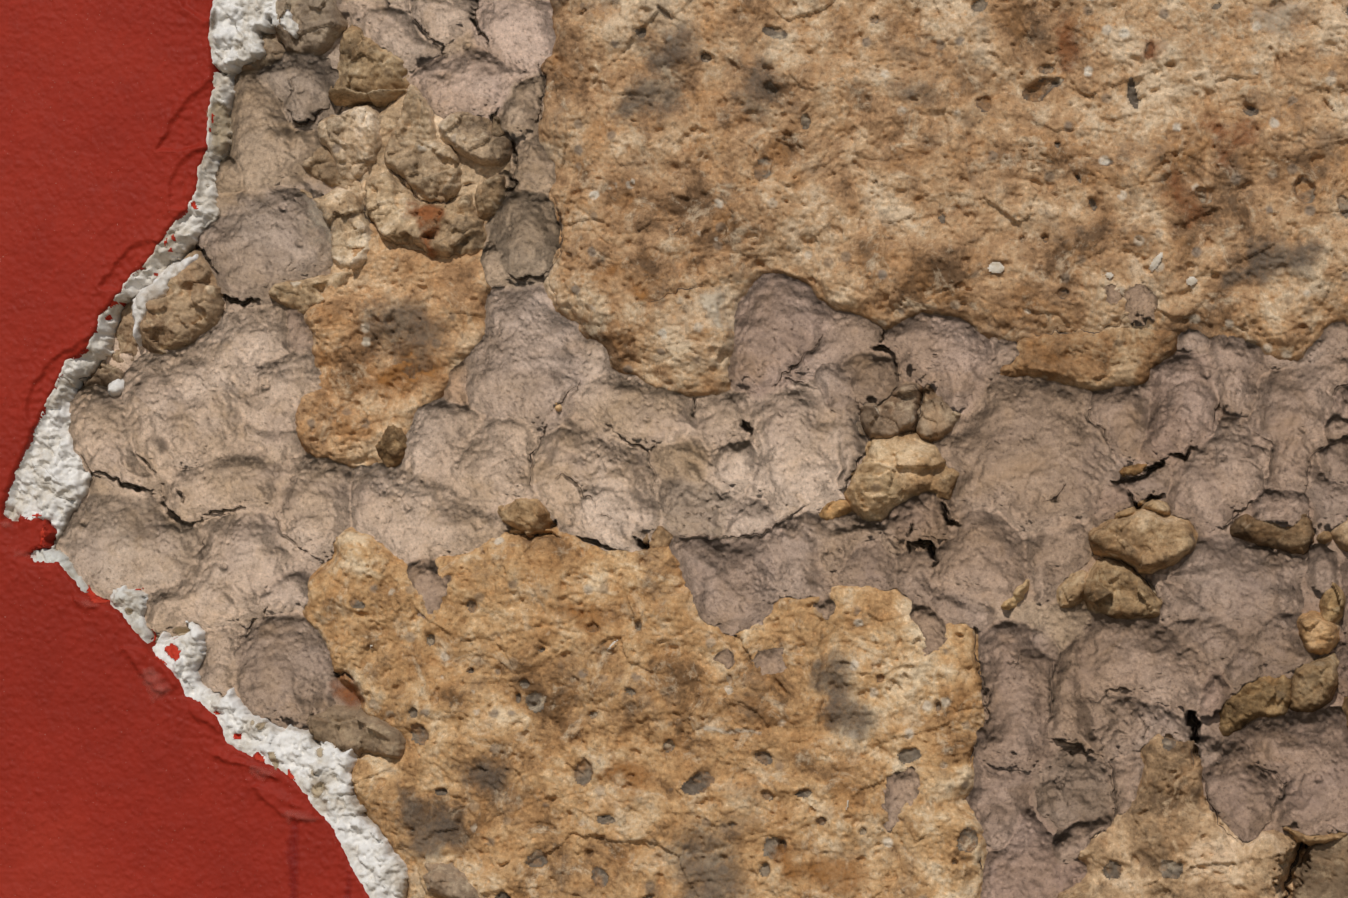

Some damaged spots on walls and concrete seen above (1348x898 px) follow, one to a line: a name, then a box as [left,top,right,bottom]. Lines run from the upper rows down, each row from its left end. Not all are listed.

spalling [1022,65,1064,102]
spalling [1127,77,1139,109]
spalling [4,0,409,898]
crack [1121,450,1190,509]
crack [1224,431,1343,557]
spalling [408,707,429,745]
spalling [574,757,593,787]
spalling [680,772,715,795]
spalling [897,748,922,764]
spalling [526,849,548,867]
spalling [759,837,786,877]
spalling [1102,860,1123,880]